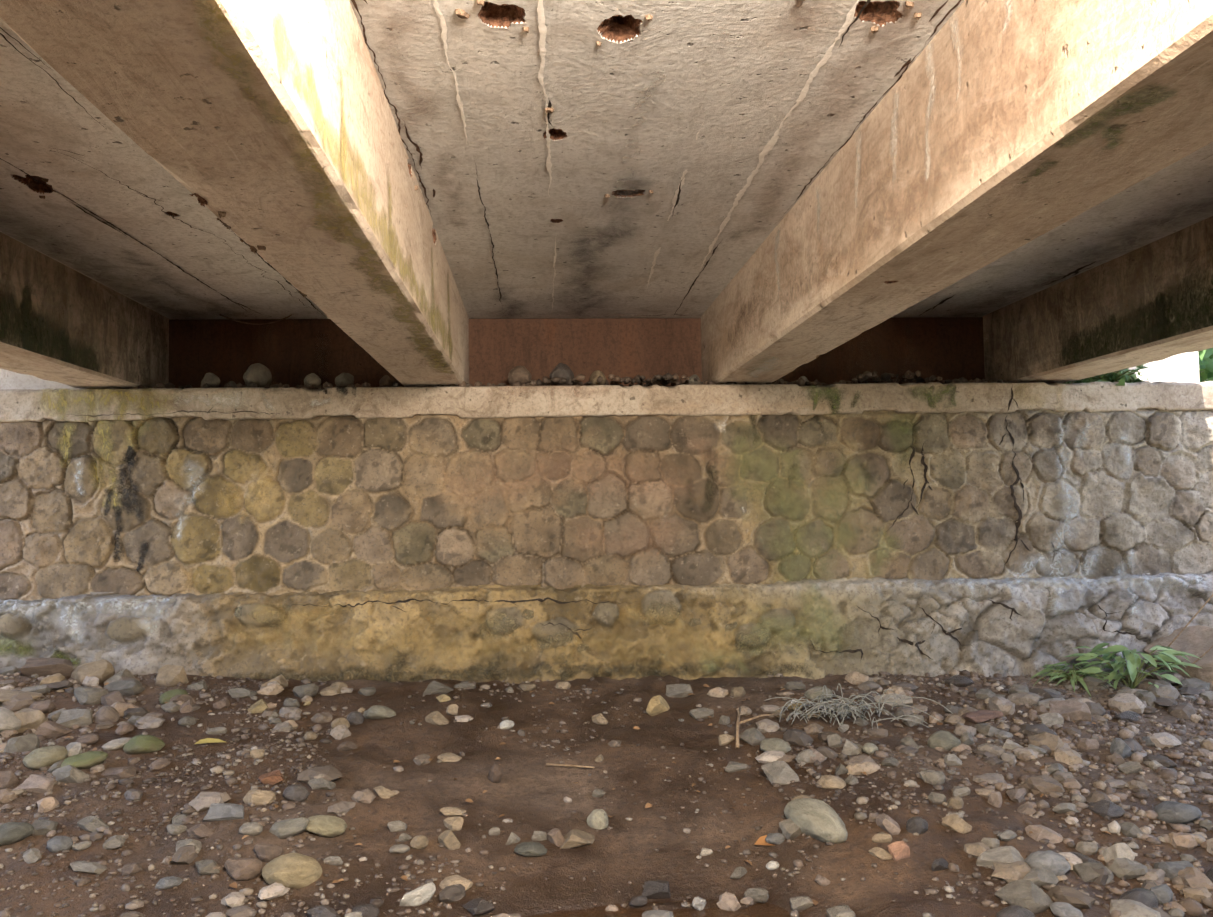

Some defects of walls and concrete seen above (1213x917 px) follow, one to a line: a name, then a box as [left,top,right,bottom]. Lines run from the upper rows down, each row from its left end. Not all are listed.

crack [0,148,327,318]
crack [433,0,503,309]
crack [886,416,932,532]